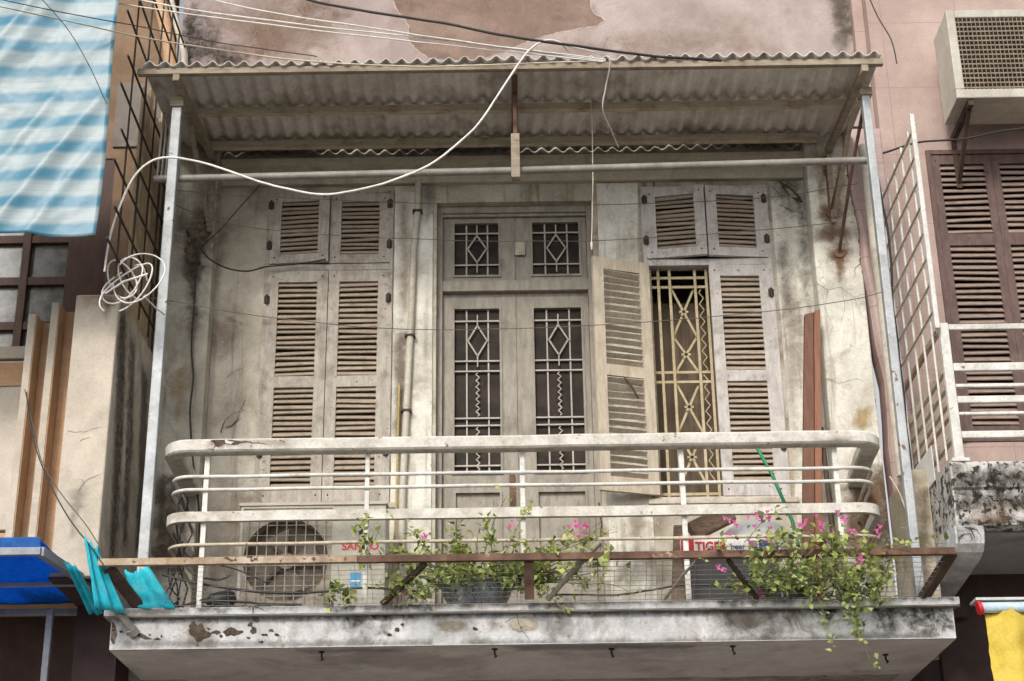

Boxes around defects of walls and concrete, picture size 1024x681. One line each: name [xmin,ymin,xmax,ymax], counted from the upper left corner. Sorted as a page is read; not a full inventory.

peeling [392,0,606,61]
water stain [833,0,852,44]
corrosion [830,247,847,276]
crack [816,165,867,334]
water stain [110,313,184,571]
peeling [208,401,264,449]
water stain [954,464,1024,524]
peeling [188,617,279,646]